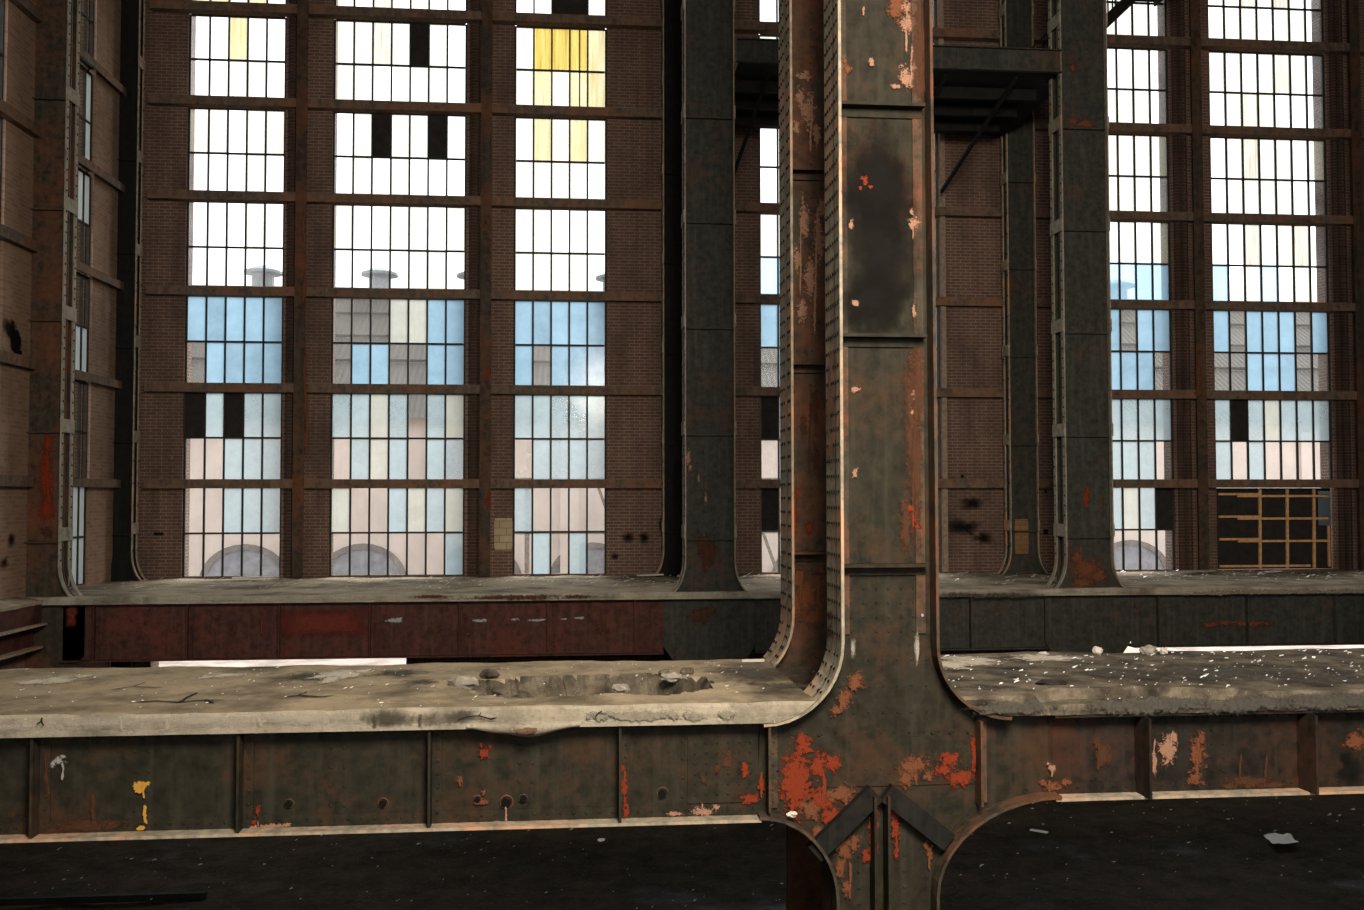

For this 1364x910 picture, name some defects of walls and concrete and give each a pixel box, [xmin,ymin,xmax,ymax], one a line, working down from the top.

peeling [890,0,917,90]
corrosion [830,671,868,718]
corrosion [666,803,720,817]
corrosion [701,727,859,837]
corrosion [895,733,976,790]
corrosion [1152,728,1286,790]
corrosion [1342,728,1364,756]
corrosion [835,809,901,899]